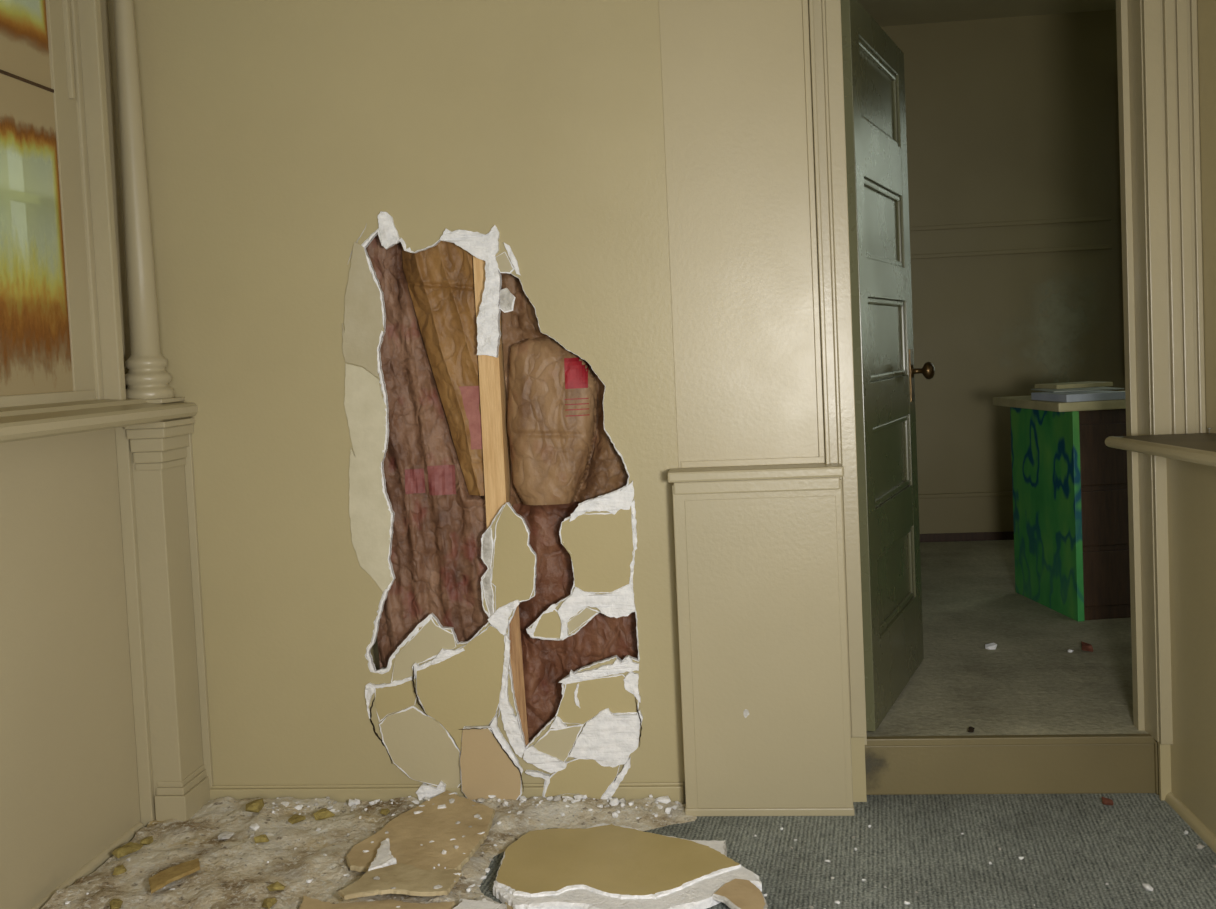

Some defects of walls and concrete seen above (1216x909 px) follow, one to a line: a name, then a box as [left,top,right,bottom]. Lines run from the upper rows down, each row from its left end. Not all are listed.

spalling [342,211,643,800]